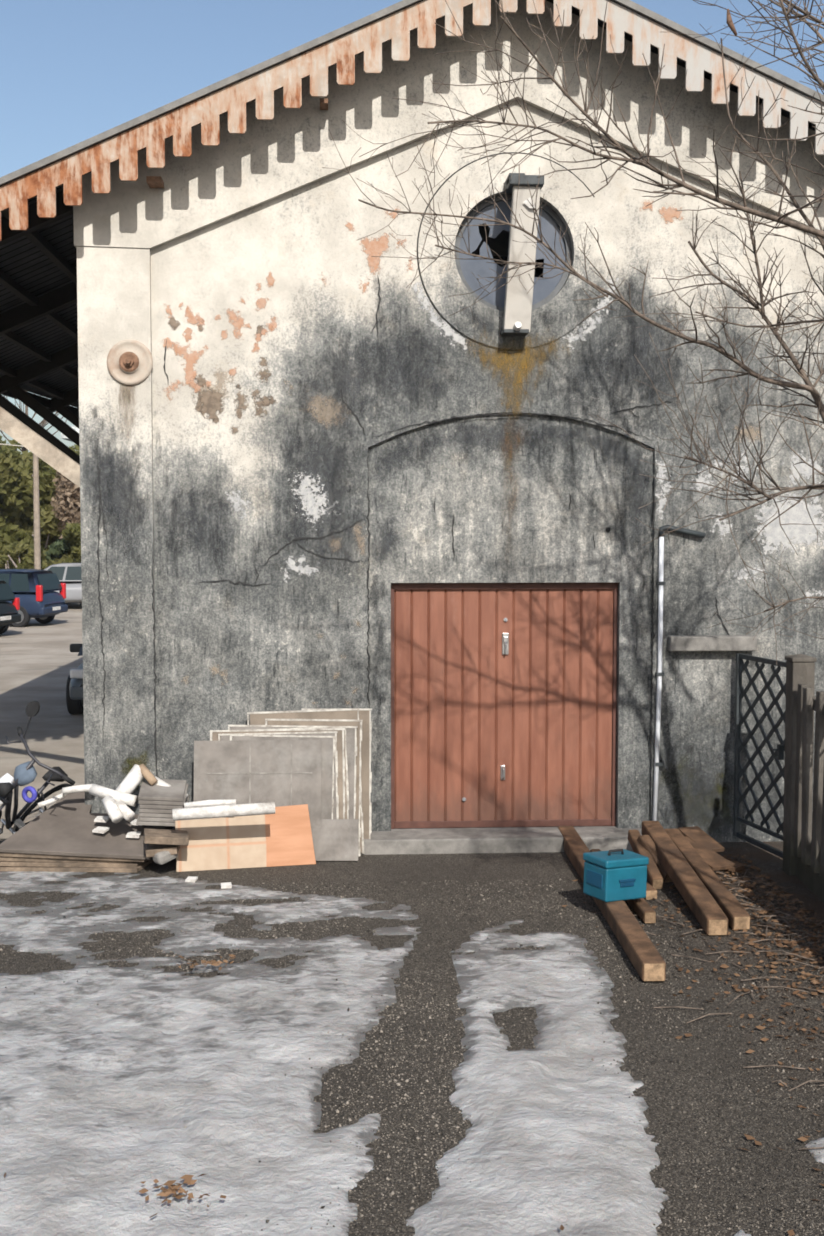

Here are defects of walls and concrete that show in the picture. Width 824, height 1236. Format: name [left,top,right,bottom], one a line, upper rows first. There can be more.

peeling [642,200,683,224]
peeling [345,222,405,292]
flaking render [408,260,467,350]
peeling [163,272,291,434]
peeling [306,395,351,425]
water stain [92,454,145,539]
flaking render [223,489,251,520]
flaking render [288,472,341,530]
water stain [288,441,345,560]
water stain [376,424,645,537]
flaking render [281,554,320,583]